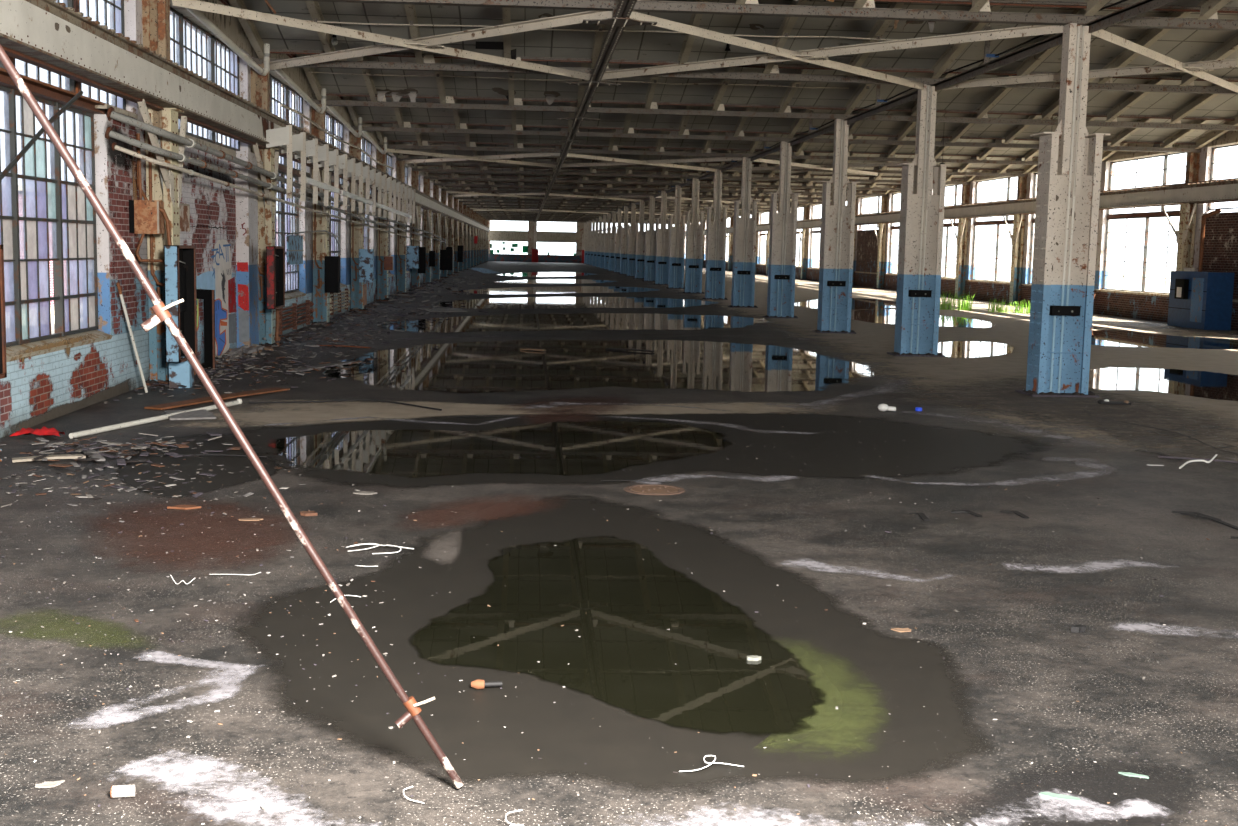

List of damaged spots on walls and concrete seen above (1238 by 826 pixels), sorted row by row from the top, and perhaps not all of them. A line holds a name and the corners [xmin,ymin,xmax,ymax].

peeling [109,155,137,328]
peeling [192,189,236,271]
peeling [0,382,12,427]
peeling [29,373,54,417]
peeling [70,342,109,398]